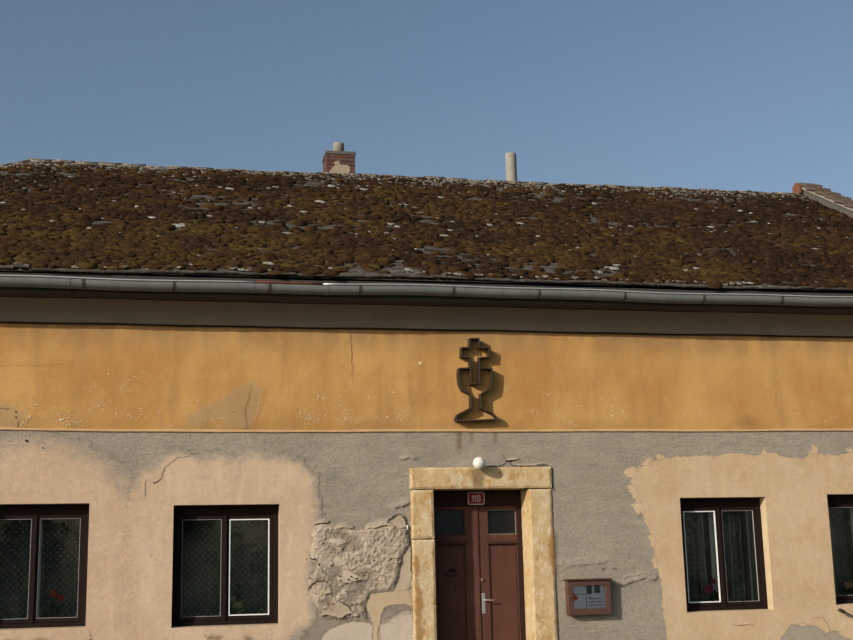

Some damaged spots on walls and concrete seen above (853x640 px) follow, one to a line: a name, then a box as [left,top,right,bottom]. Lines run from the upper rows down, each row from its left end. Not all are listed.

spalling [306,514,410,624]
spalling [781,615,850,640]